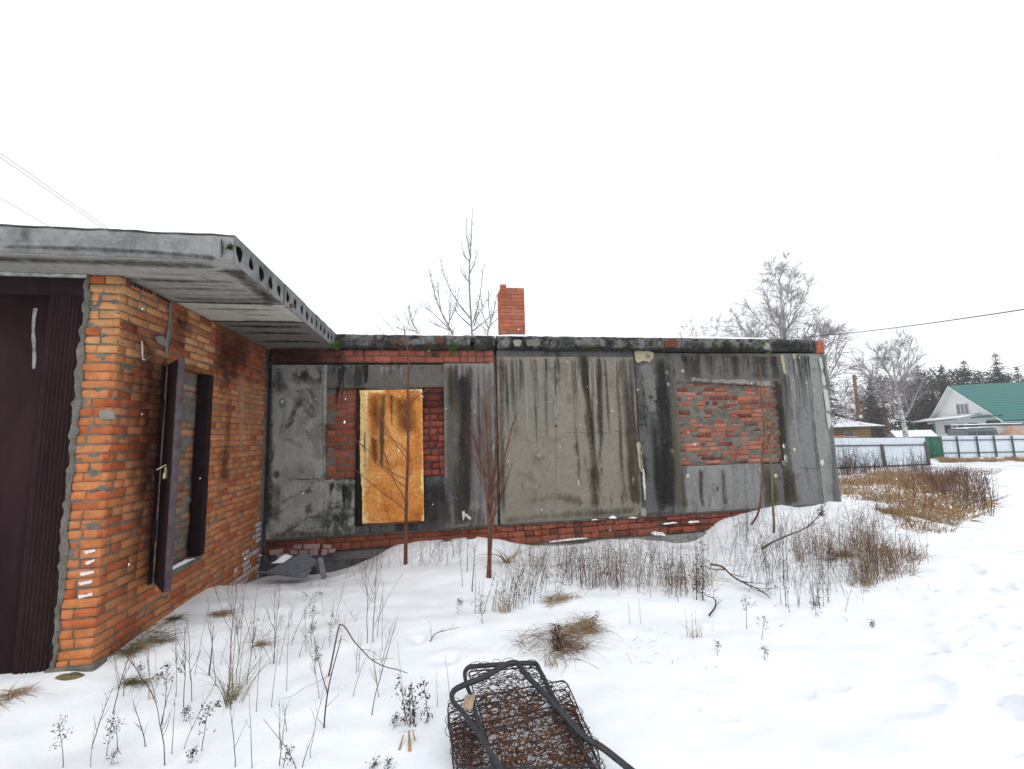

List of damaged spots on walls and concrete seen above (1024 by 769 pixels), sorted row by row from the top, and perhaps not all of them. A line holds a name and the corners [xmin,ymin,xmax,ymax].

damp [0,233,492,585]
rust [372,395,412,466]
spalling [635,351,657,412]
damp [499,338,815,515]
peeling [637,442,647,516]